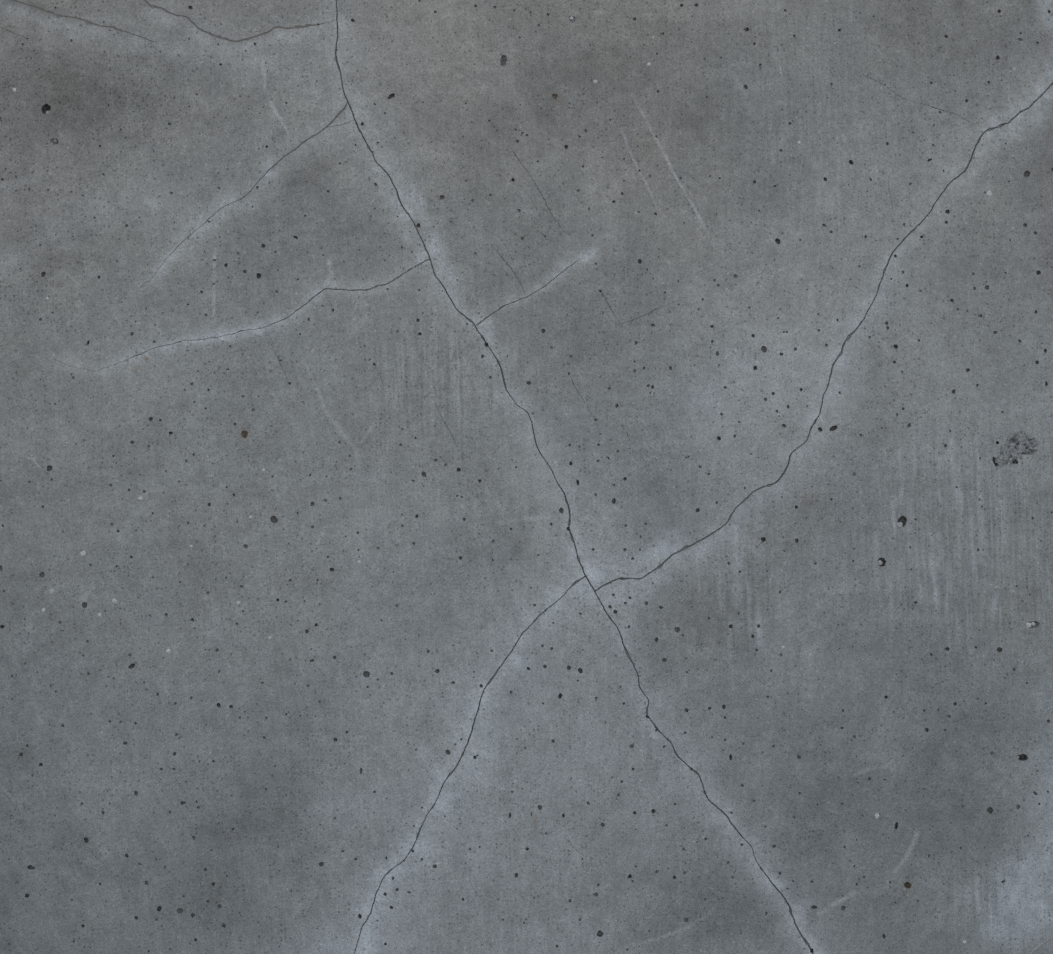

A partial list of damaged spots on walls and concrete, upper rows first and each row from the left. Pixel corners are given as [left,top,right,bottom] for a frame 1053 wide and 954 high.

crack [12,0,156,42]
crack [144,0,334,42]
crack [139,215,213,289]
crack [106,340,191,368]
crack [219,0,1053,954]